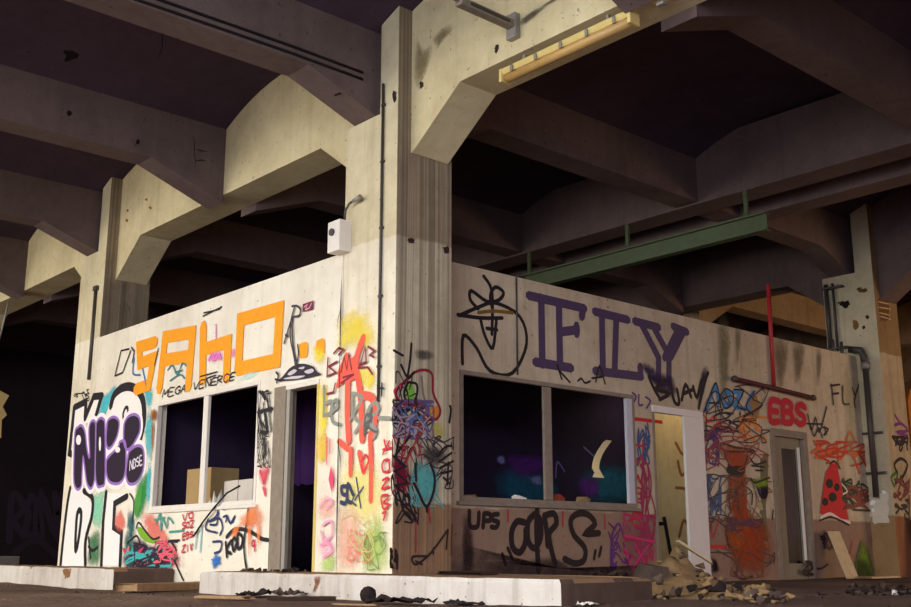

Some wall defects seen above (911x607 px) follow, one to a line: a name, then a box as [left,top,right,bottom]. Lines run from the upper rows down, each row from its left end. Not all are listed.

leakage [720,329,740,382]
leakage [777,346,803,378]